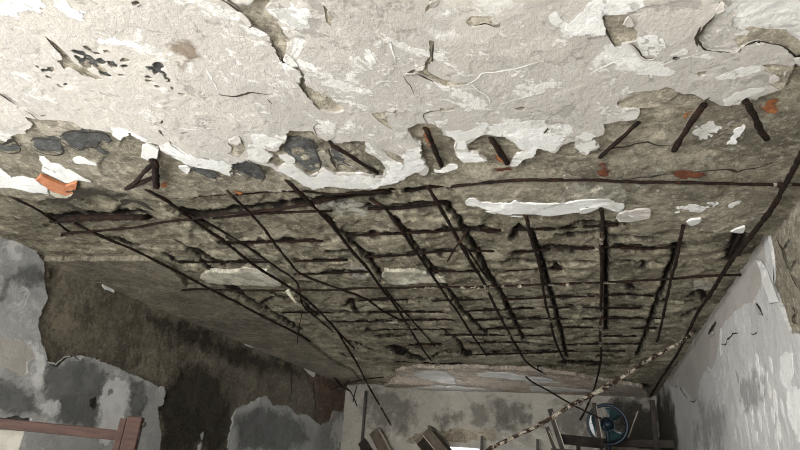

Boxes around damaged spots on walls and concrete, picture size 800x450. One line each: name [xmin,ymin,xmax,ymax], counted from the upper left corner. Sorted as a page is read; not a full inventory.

peeling [0,0,87,23]
spalling [36,37,142,79]
rust [671,102,708,153]
rust [741,98,778,141]
spalling [97,0,800,401]
flaking render [0,123,426,450]
rust [8,121,800,426]
crack [708,322,757,345]
water stain [0,340,147,430]
water stain [147,317,345,450]
flaking render [437,428,497,443]